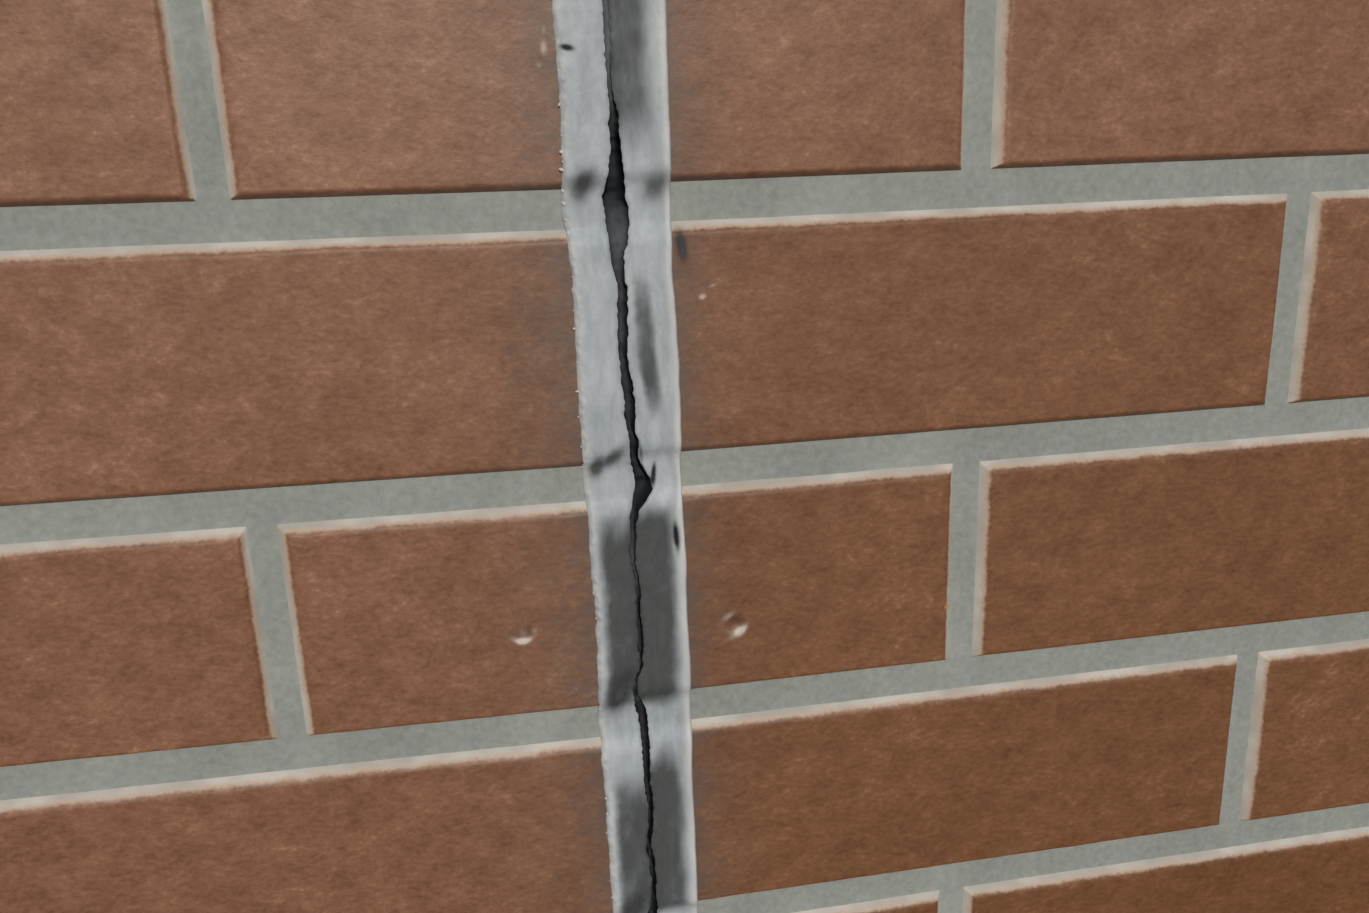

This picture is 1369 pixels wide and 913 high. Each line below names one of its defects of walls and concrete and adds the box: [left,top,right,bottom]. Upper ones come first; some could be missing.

crack [602,0,659,913]